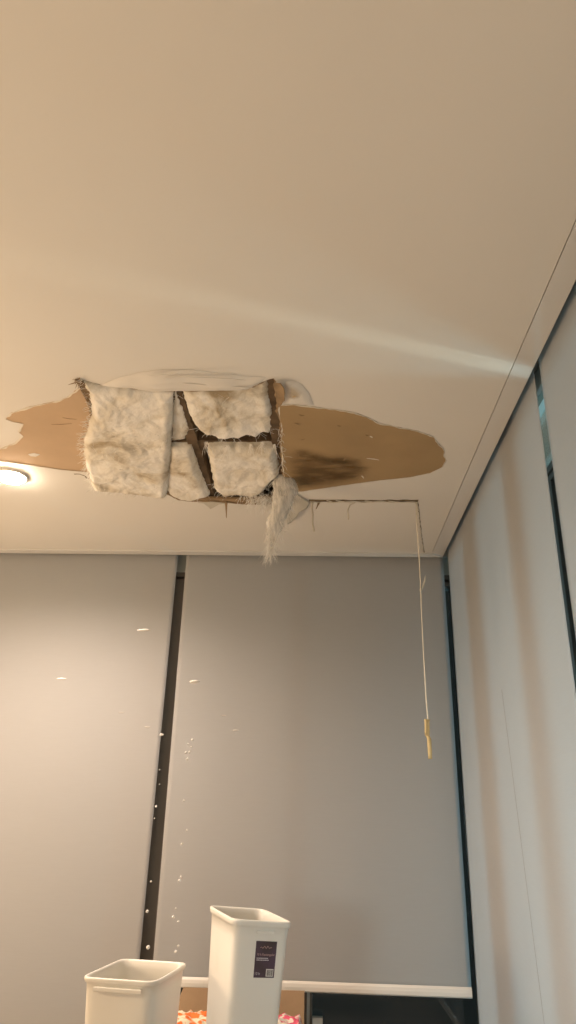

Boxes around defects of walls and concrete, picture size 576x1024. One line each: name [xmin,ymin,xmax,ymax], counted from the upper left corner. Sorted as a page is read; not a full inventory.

peeling [0,381,100,472]
peeling [249,378,447,492]
damp [298,454,361,485]
spalling [166,493,271,505]
crack [309,499,425,553]